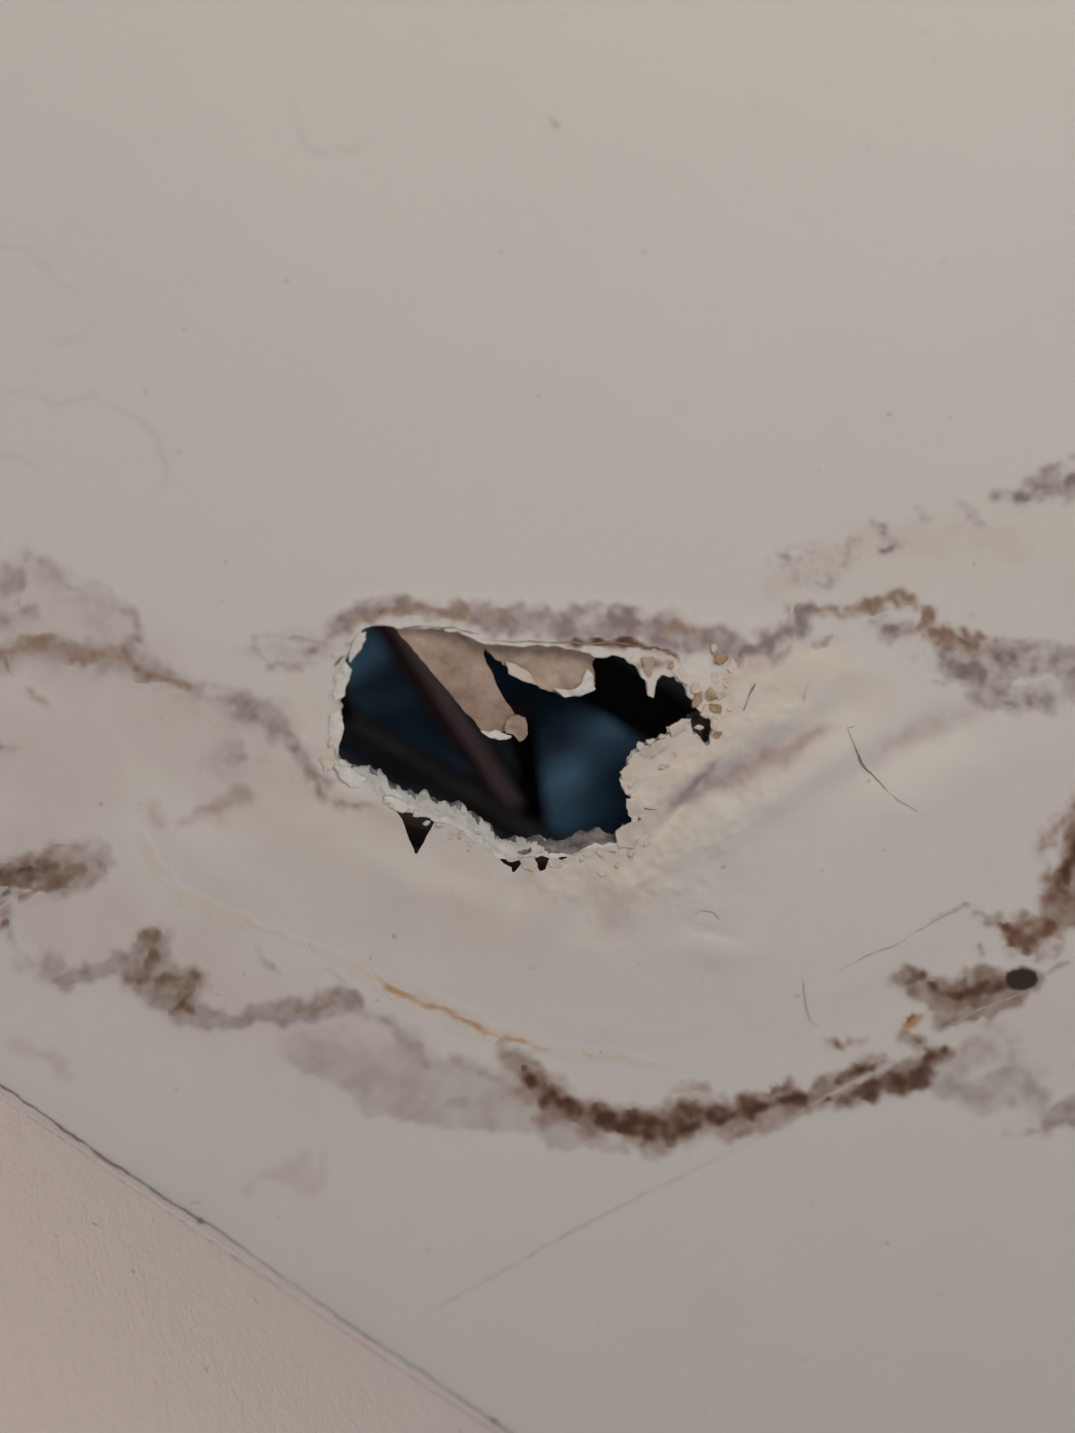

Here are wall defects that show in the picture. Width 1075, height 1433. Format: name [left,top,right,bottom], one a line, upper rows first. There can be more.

leakage [0,450,1075,835]
leakage [0,775,1075,1166]
flaking render [319,625,905,955]